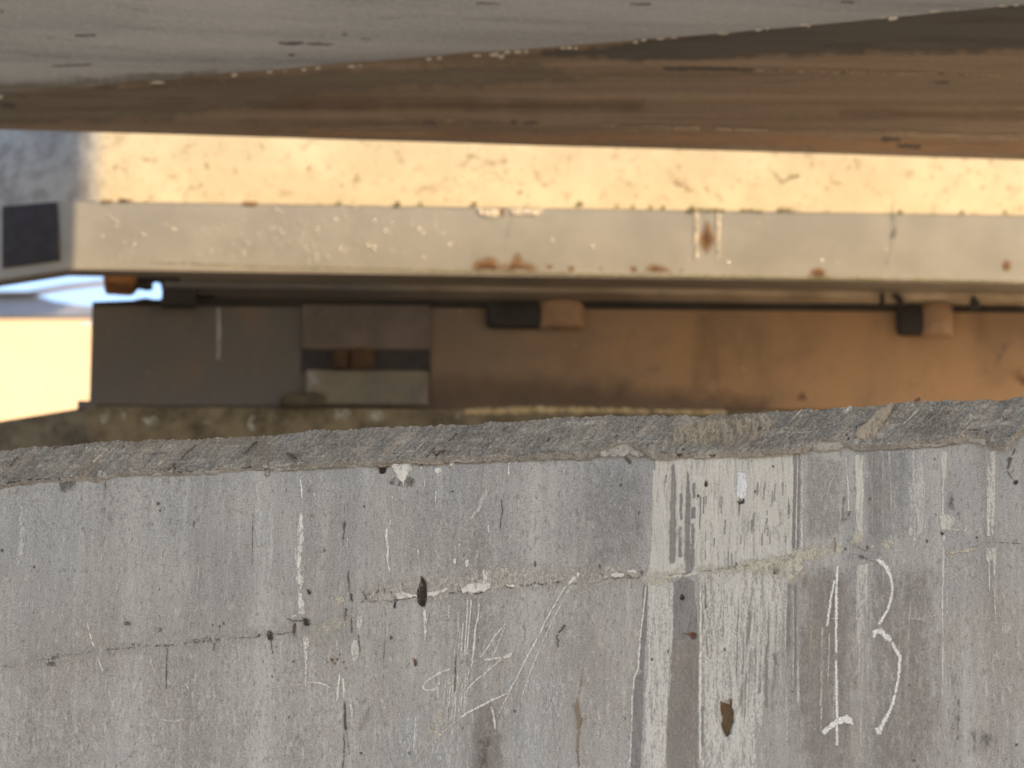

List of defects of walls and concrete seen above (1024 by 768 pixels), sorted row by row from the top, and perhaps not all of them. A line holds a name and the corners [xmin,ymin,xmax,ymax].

corrosion [473,255,553,271]
corrosion [699,222,714,250]
crack [4,618,304,687]
crack [344,562,639,678]
leakage [361,450,997,768]
crack [342,703,350,768]